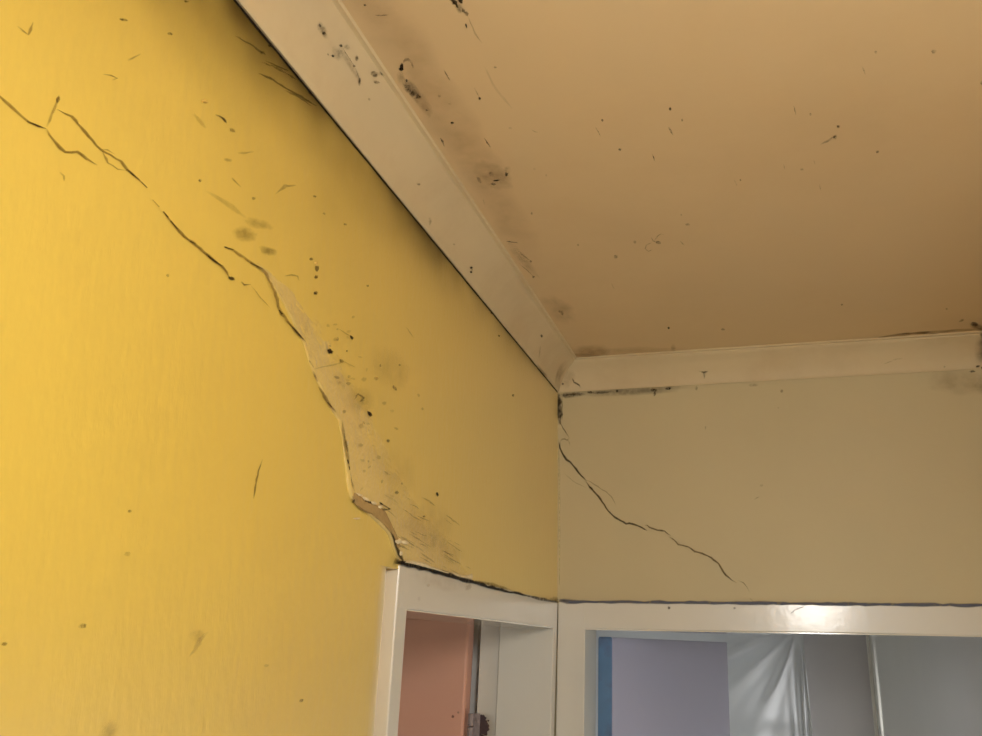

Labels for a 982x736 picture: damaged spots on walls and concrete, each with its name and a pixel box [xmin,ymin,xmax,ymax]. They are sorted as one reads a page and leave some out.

crack [2,97,140,181]
crack [163,211,302,338]
crack [234,0,982,607]
spalling [352,493,473,580]